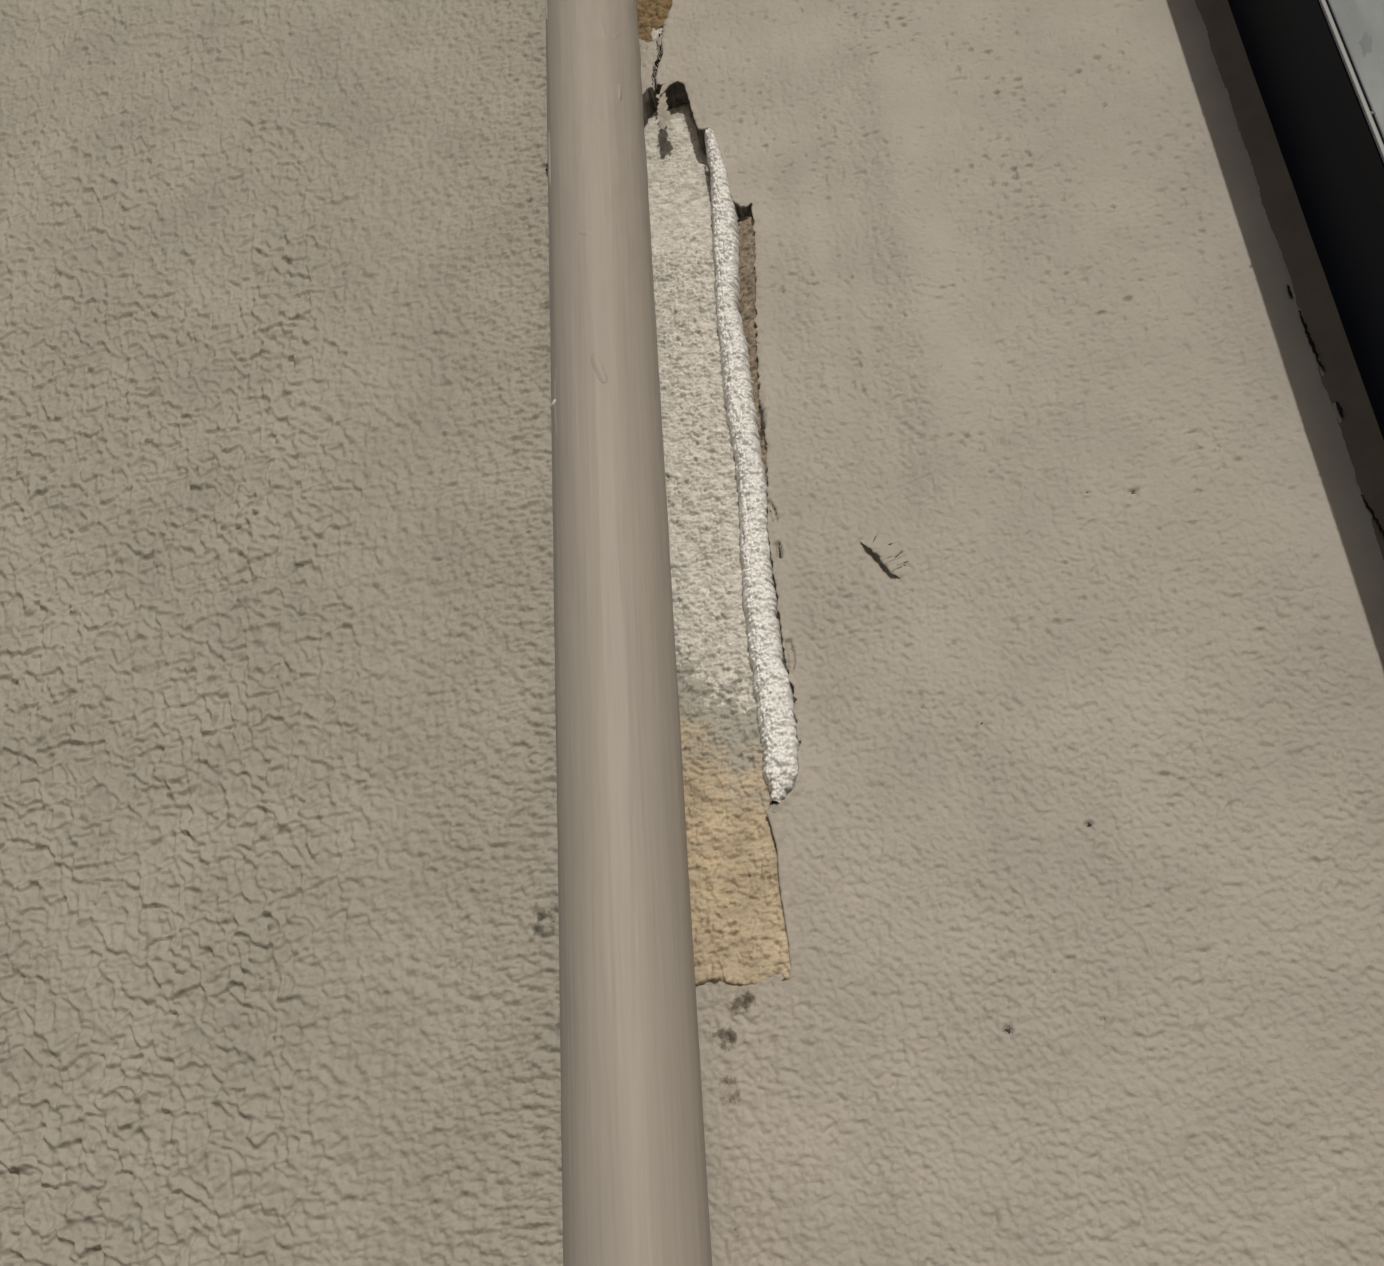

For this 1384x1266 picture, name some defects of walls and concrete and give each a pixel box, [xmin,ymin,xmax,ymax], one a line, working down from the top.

spalling [637,0,682,46]
spalling [644,78,806,995]